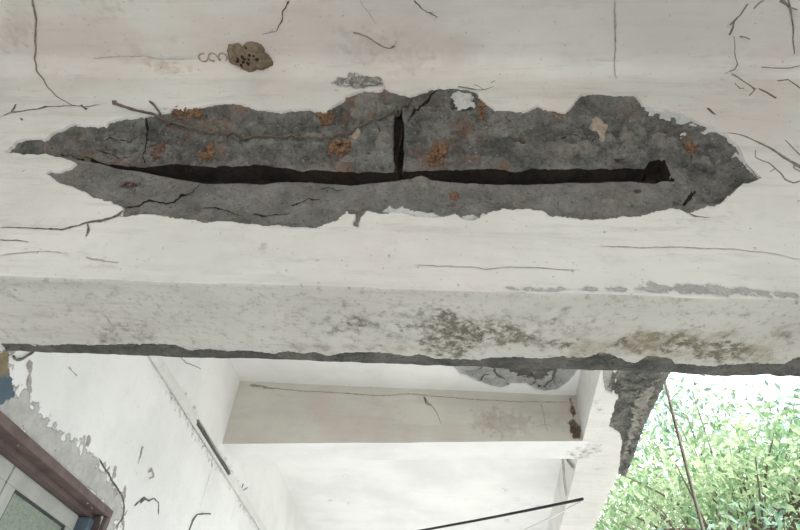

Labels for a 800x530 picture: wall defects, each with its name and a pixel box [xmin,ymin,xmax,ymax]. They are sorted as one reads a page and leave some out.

crack [611,3,619,79]
crack [3,104,94,121]
spalling [9,73,759,228]
crack [0,210,124,256]
crack [607,246,797,259]
crack [422,263,574,271]
peeling [610,281,798,304]
damp [473,320,534,346]
damp [695,337,756,362]
spalling [0,343,800,530]